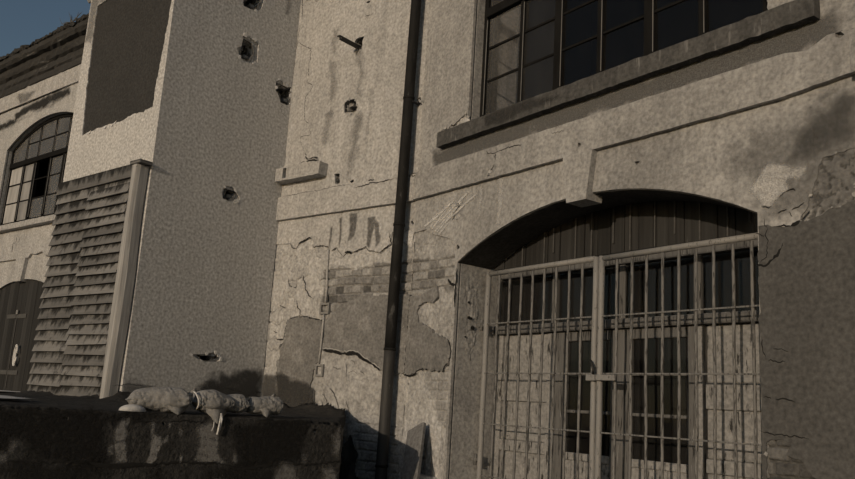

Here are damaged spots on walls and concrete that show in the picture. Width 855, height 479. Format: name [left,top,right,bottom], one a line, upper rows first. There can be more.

spalling [243,0,263,12]
spalling [237,32,258,64]
spalling [275,78,292,105]
spalling [222,186,240,204]
flaking render [802,148,855,221]
spalling [190,351,223,362]
flaking render [261,221,457,479]